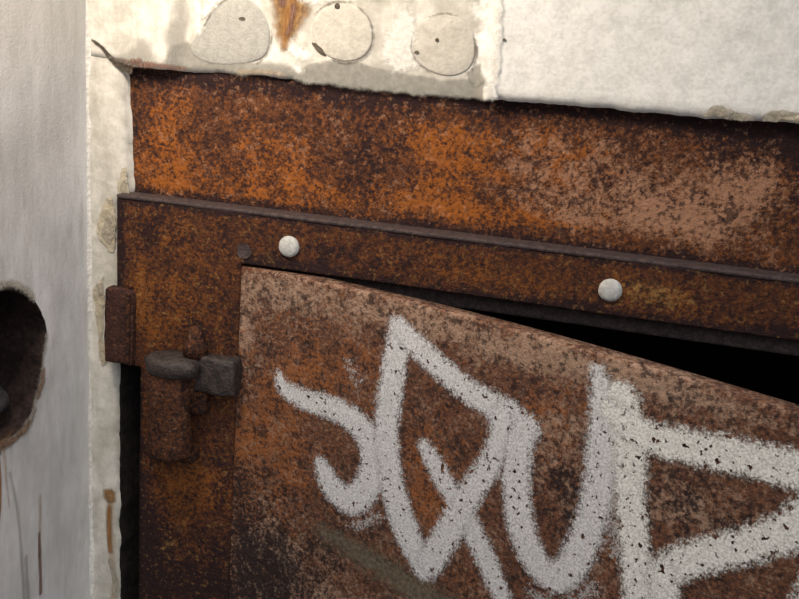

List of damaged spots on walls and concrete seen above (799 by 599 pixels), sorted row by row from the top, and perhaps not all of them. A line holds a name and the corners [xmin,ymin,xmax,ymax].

rust [273,0,309,50]
spalling [0,281,47,452]
rust [104,489,118,596]